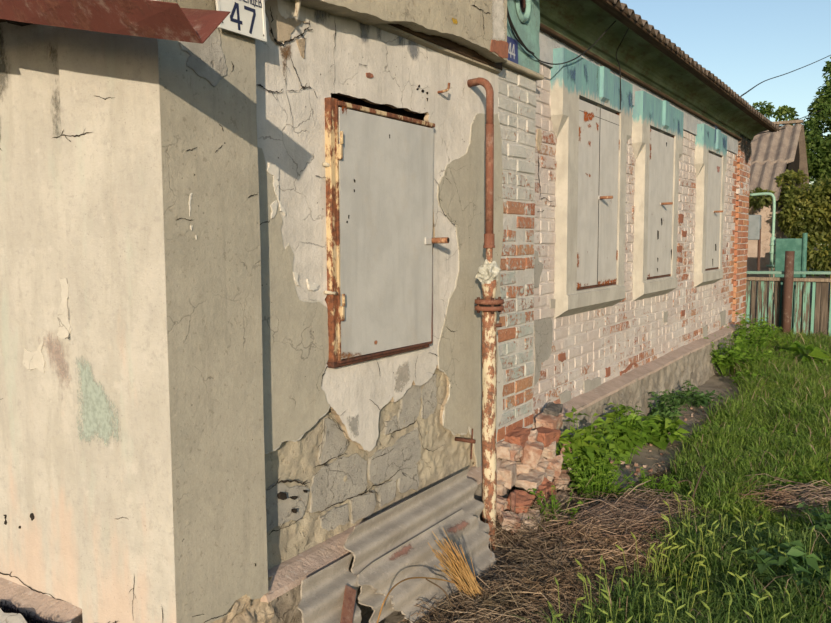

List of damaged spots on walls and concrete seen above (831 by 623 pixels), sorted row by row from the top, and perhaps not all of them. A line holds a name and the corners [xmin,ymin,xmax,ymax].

leakage [0,28,8,94]
spalling [161,0,216,10]
spalling [179,27,227,86]
spalling [264,0,309,59]
crack [258,6,317,127]
flaking render [489,40,509,59]
crack [53,128,92,142]
rust [579,111,599,145]
peeling [266,163,286,218]
spalling [277,490,308,514]